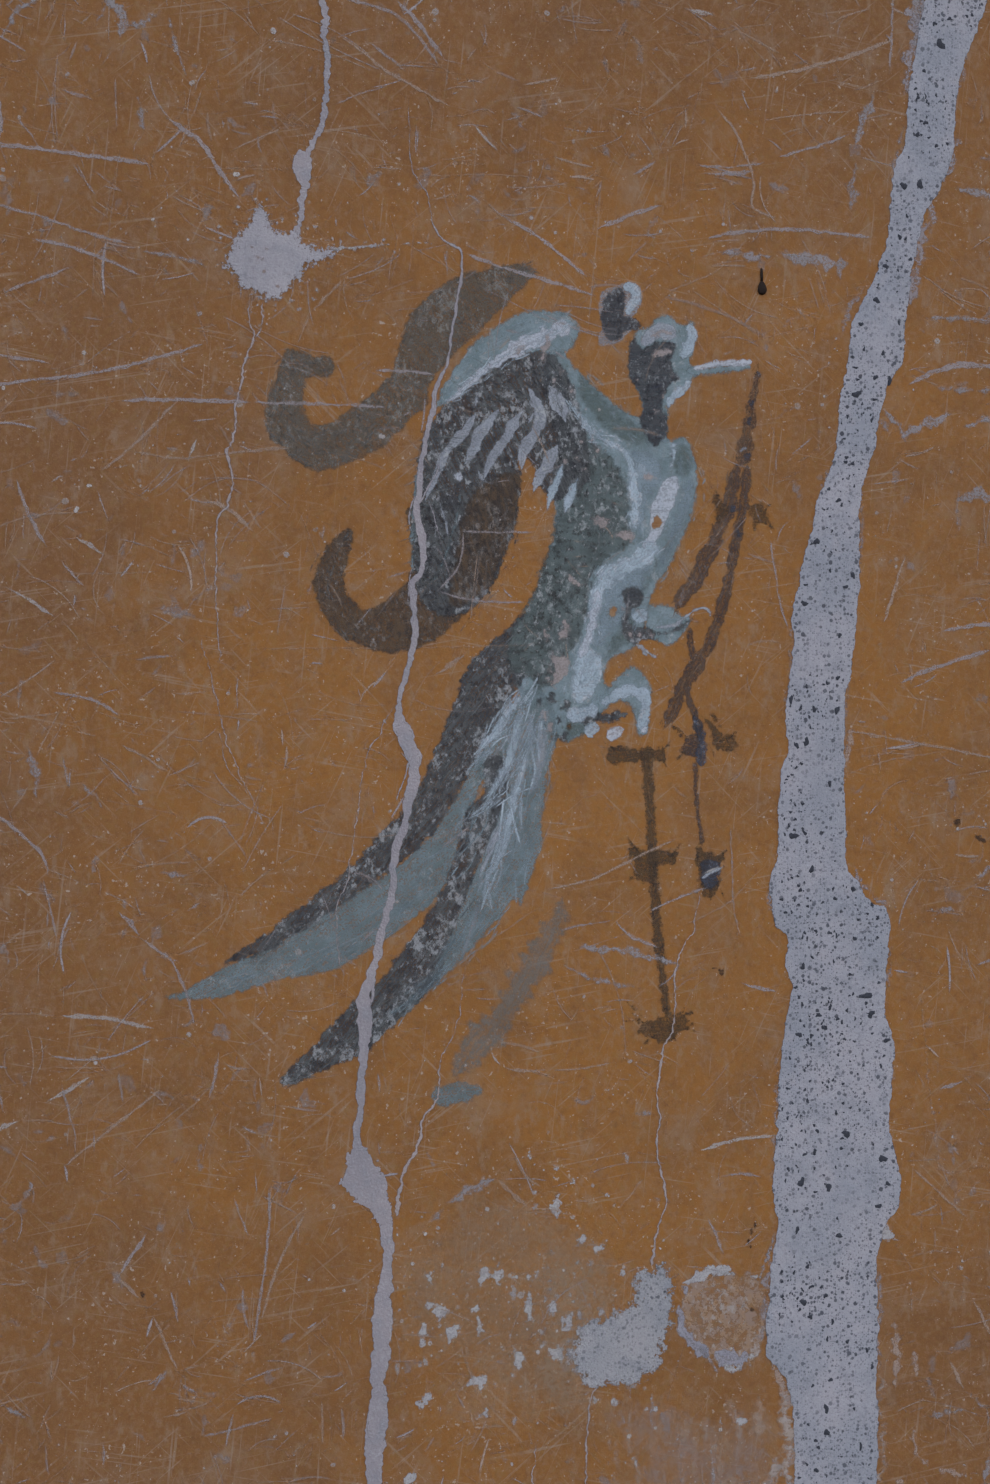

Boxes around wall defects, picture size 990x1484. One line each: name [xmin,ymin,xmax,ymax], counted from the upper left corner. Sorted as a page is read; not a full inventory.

crack [292,0,331,235]
crack [201,300,266,831]
crack [335,112,466,1484]
crack [760,0,987,1484]
peeling [418,1294,485,1367]
spalling [462,1234,765,1402]